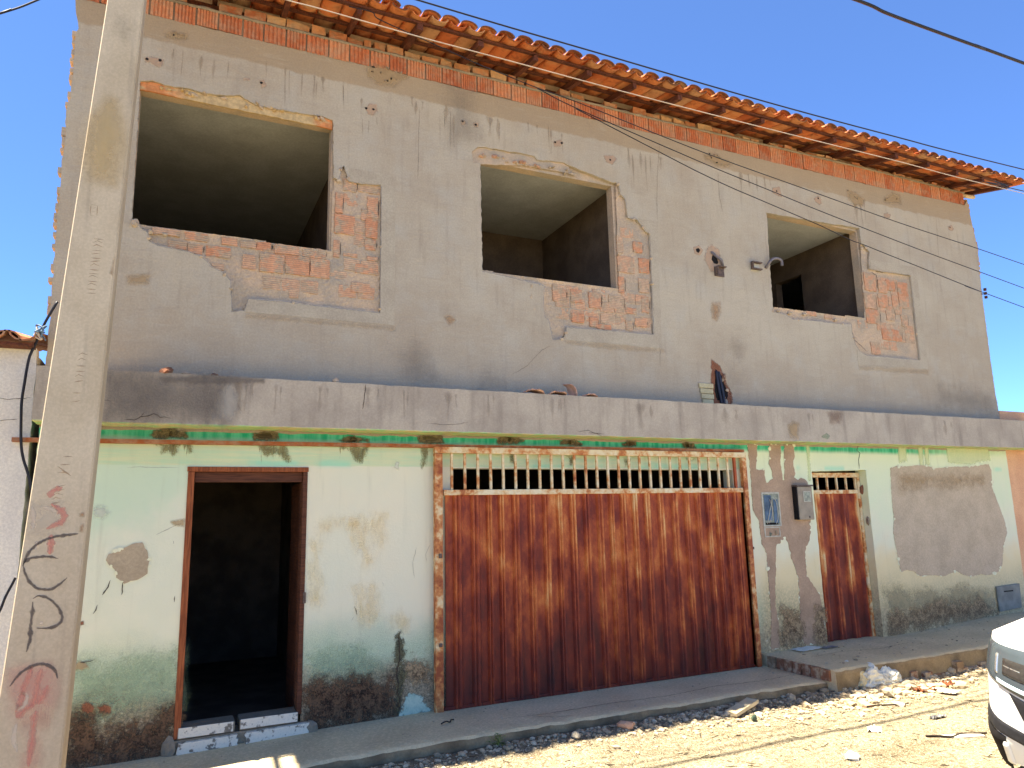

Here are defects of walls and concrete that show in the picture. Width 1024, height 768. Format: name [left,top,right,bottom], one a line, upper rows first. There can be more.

flaking render [131,166,382,313]
flaking render [482,183,654,340]
flaking render [772,245,920,360]
water stain [112,373,264,419]
hole [699,360,733,404]
peeling [93,542,152,614]
peeling [747,444,826,650]
water stain [887,586,998,636]
peeling [890,464,1007,578]
water stain [300,661,429,729]
water stain [66,702,184,768]